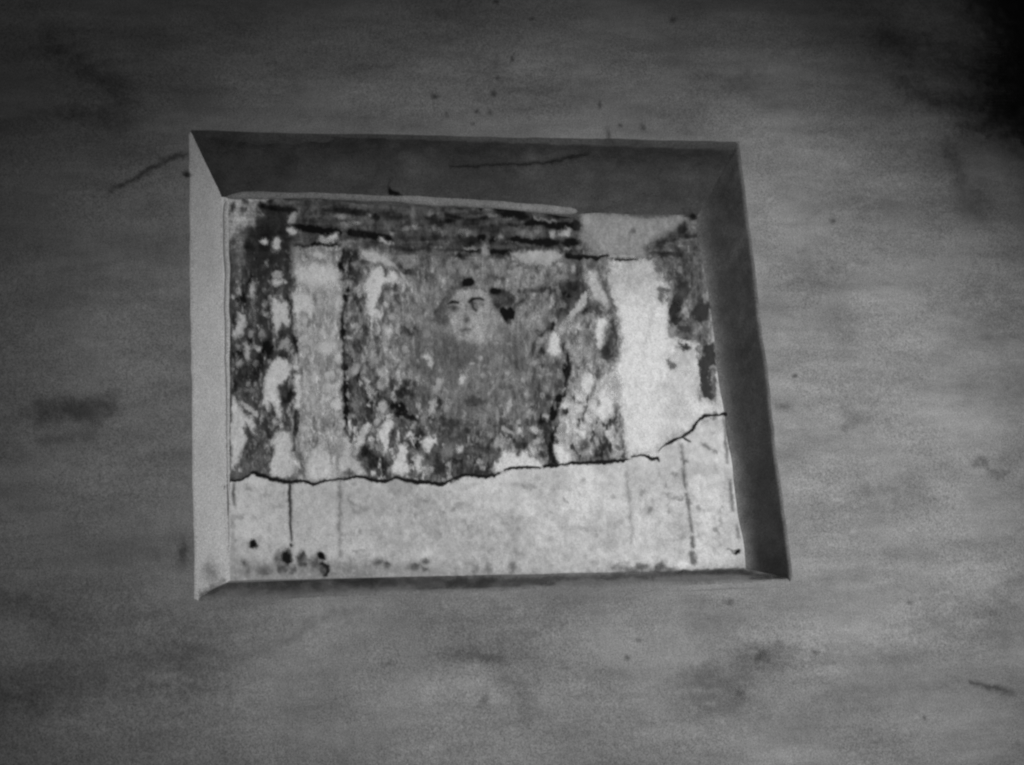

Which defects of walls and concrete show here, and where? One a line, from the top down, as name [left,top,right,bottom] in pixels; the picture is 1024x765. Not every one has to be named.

peeling [229,206,721,481]
crack [230,412,727,547]
spalling [275,549,327,576]